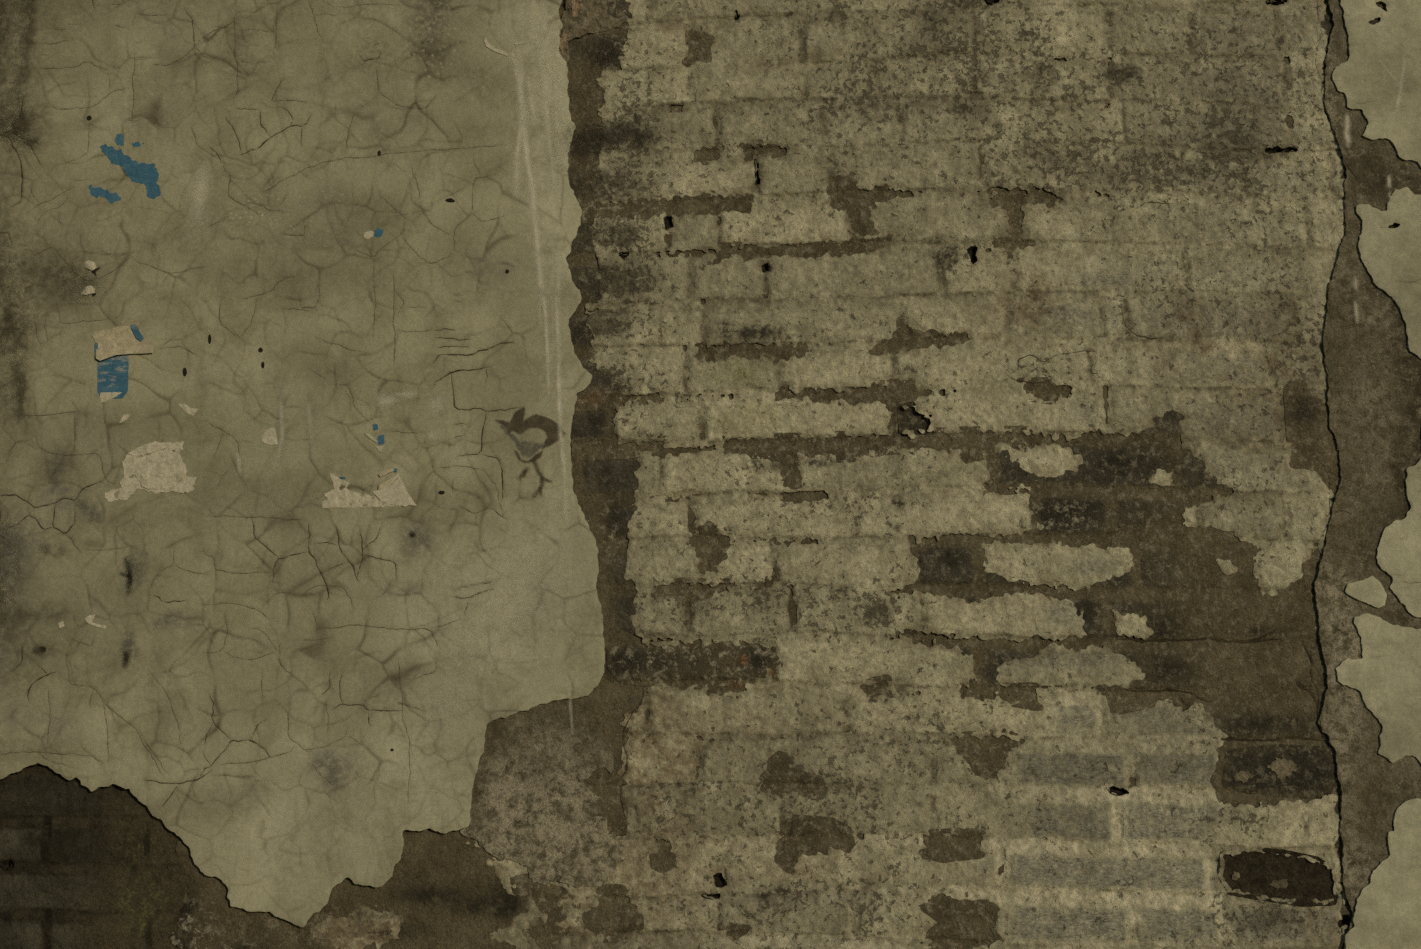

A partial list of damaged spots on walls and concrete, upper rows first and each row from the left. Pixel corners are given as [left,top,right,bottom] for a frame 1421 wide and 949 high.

crack [0,0,518,518]
crack [0,393,126,550]
peeling [460,0,1421,949]
crack [3,515,493,807]
peeling [0,763,548,949]